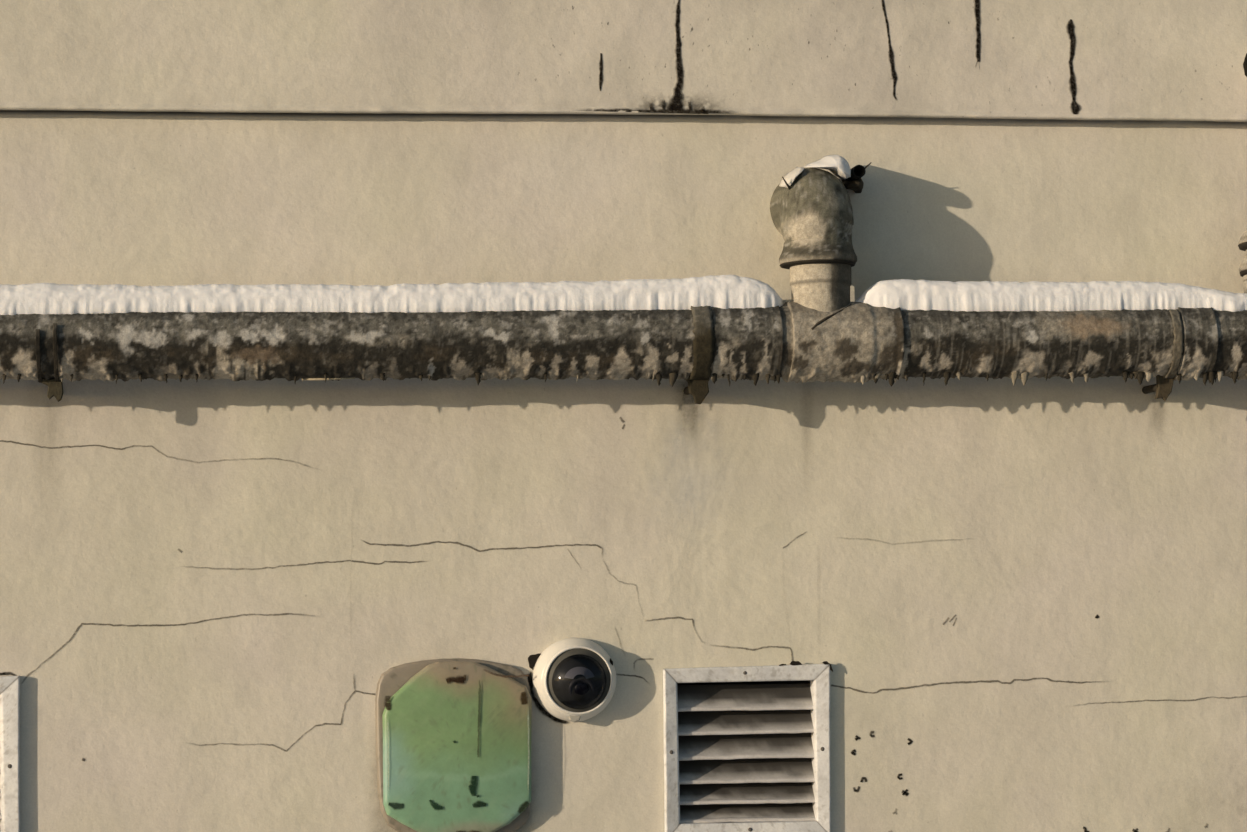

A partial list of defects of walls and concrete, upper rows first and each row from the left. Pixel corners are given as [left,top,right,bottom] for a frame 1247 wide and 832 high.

crack [670,0,684,110]
crack [882,0,897,99]
crack [974,0,982,62]
crack [1067,19,1080,114]
crack [0,440,153,450]
crack [242,541,601,569]
crack [0,613,292,678]
crack [652,617,694,626]
crack [738,646,793,661]
crack [269,681,375,751]
crack [831,678,1235,704]